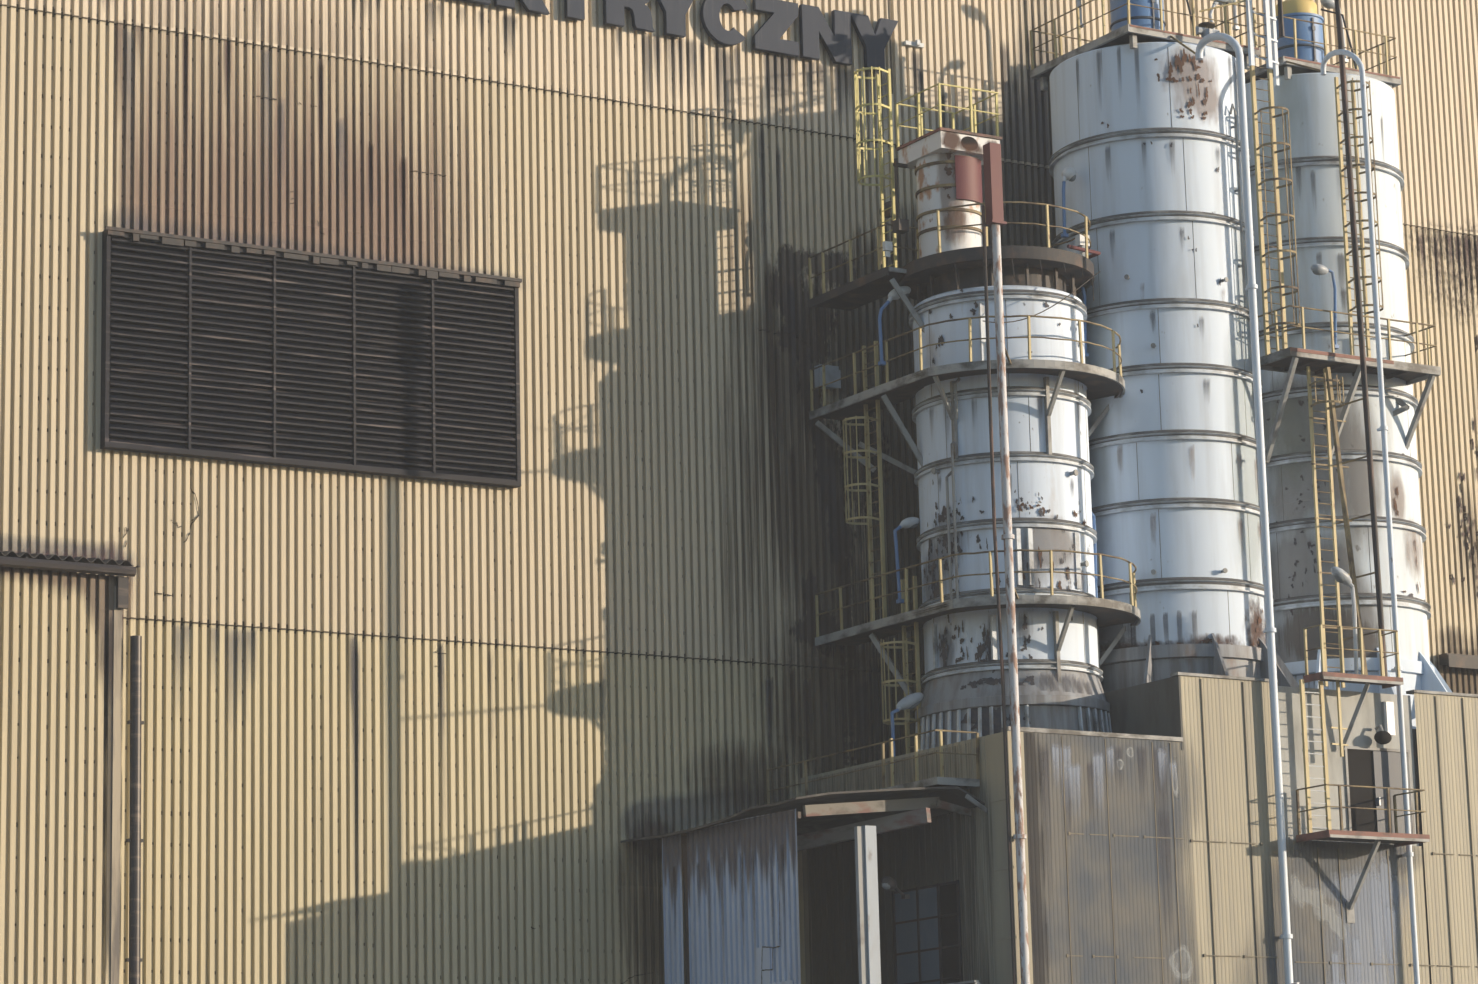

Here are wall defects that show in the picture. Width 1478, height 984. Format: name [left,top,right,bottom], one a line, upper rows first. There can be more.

corrosion [1155,49,1212,120]
corrosion [1019,503,1086,590]
leakage [1052,747,1113,783]